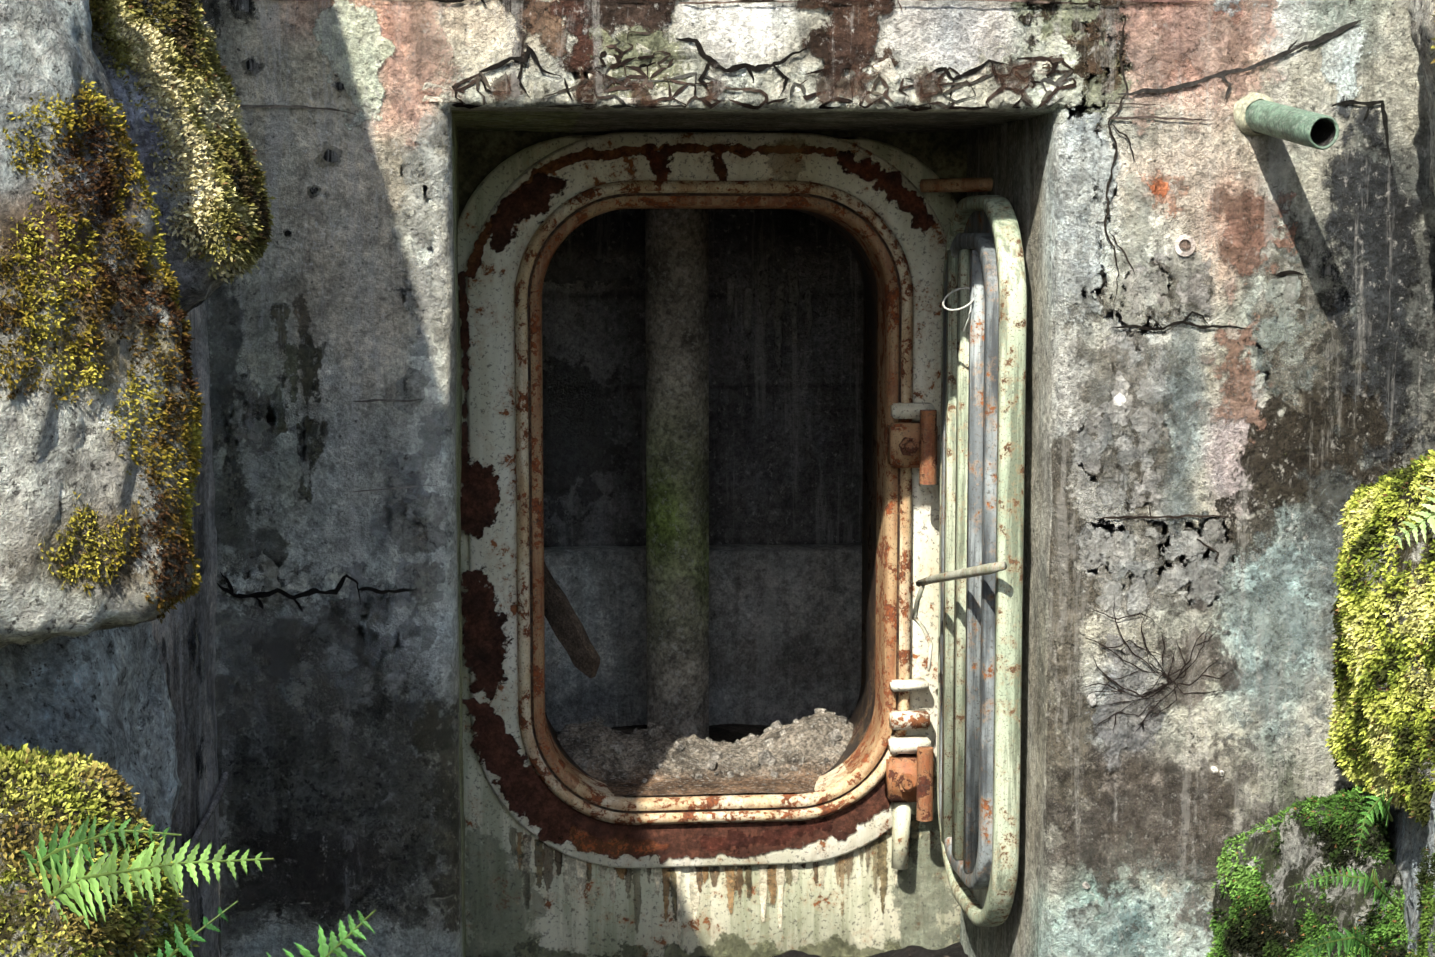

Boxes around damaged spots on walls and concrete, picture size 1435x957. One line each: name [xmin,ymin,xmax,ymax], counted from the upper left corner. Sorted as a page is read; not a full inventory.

crack [217,572,417,612]
corrosion [461,565,898,946]
corrosion [458,141,936,540]
crack [419,0,1364,331]
corrosion [909,814,920,865]
crack [1093,657,1171,698]
peeling [1073,239,1236,615]
water stain [1208,95,1435,565]
crack [1331,100,1391,161]